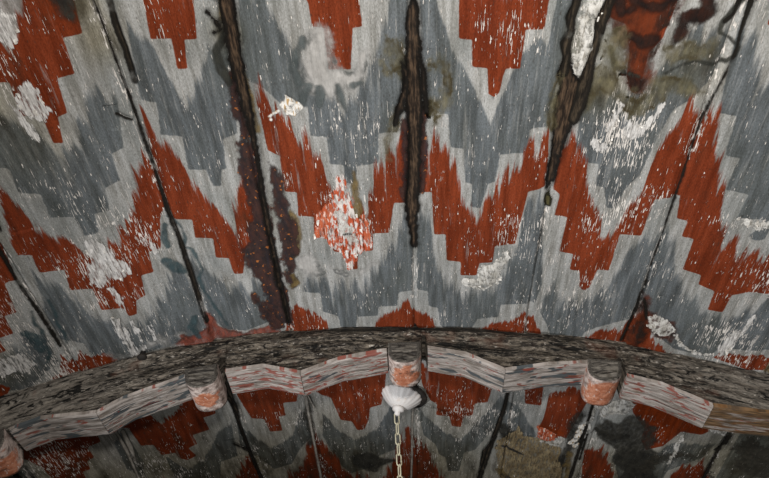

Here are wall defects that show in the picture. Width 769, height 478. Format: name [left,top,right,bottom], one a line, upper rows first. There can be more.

damp [589,0,745,118]
peeling [10,80,52,143]
peeling [269,95,303,121]
peeling [590,100,665,152]
peeling [313,175,373,271]
peeling [461,250,511,291]
peeling [646,315,756,357]